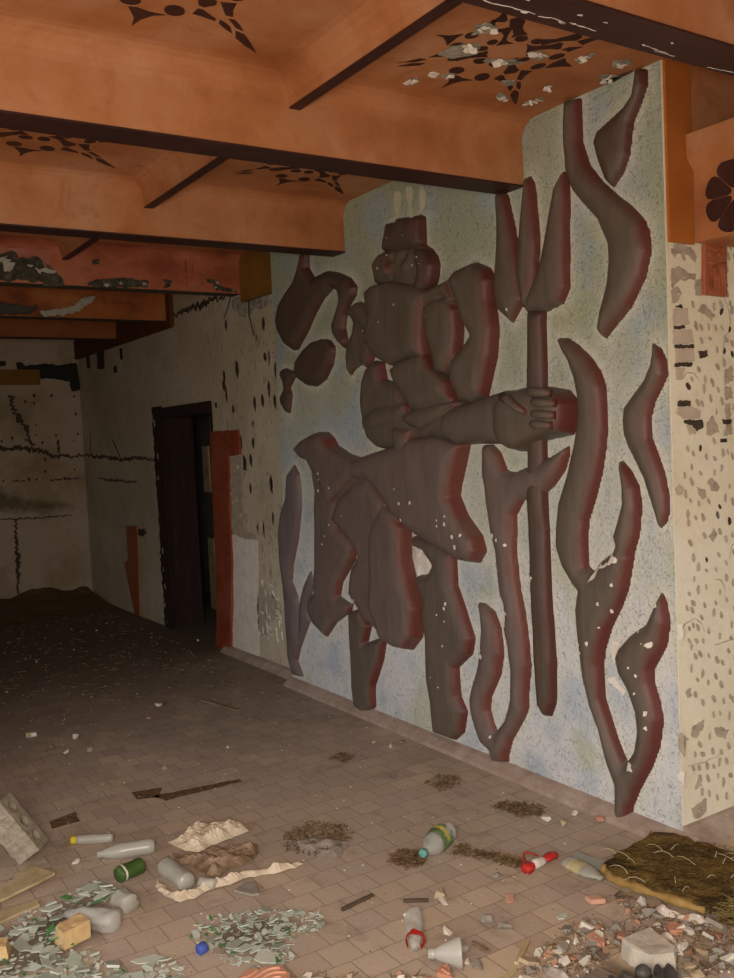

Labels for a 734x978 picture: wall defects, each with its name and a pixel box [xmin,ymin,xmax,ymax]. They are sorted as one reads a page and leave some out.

peeling [483,0,606,31]
peeling [438,22,548,68]
peeling [574,53,597,64]
peeling [403,72,455,86]
peeling [496,80,515,102]
peeling [520,84,554,107]
peeling [0,247,64,266]
crack [0,395,155,483]
crack [0,515,71,594]